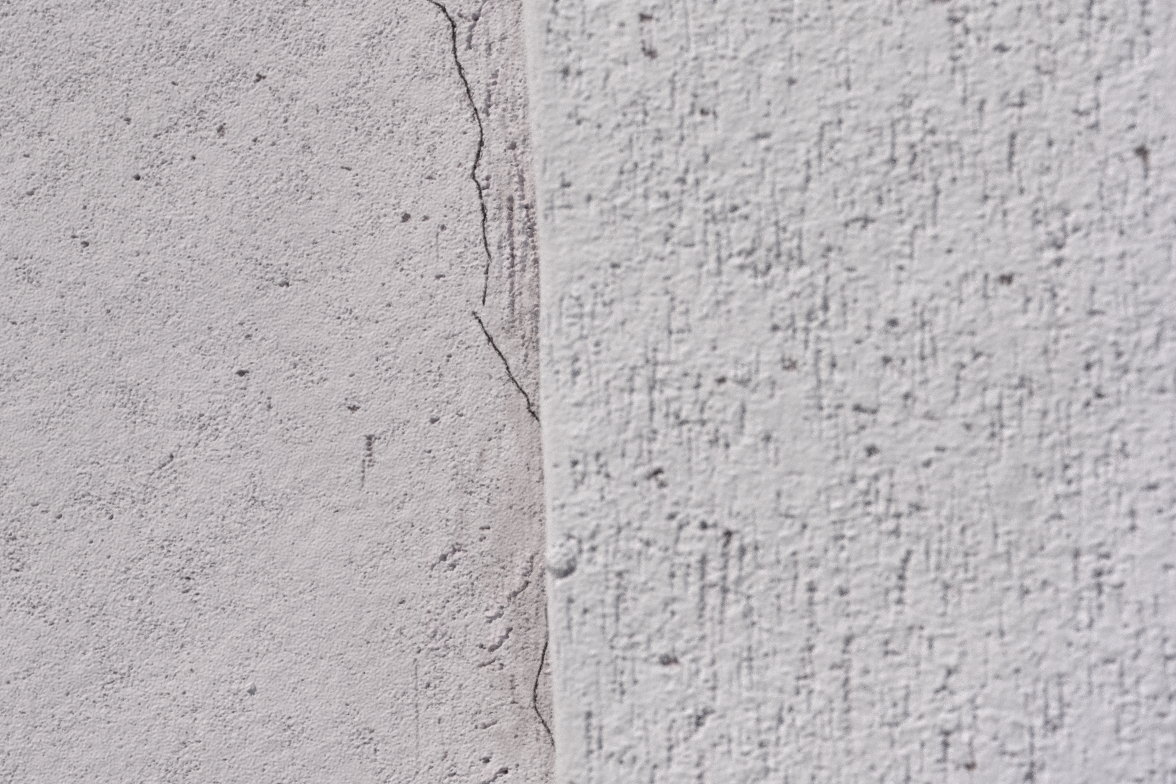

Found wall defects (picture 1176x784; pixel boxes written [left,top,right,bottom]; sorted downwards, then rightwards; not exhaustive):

crack [427,0,541,426]
crack [534,608,555,752]